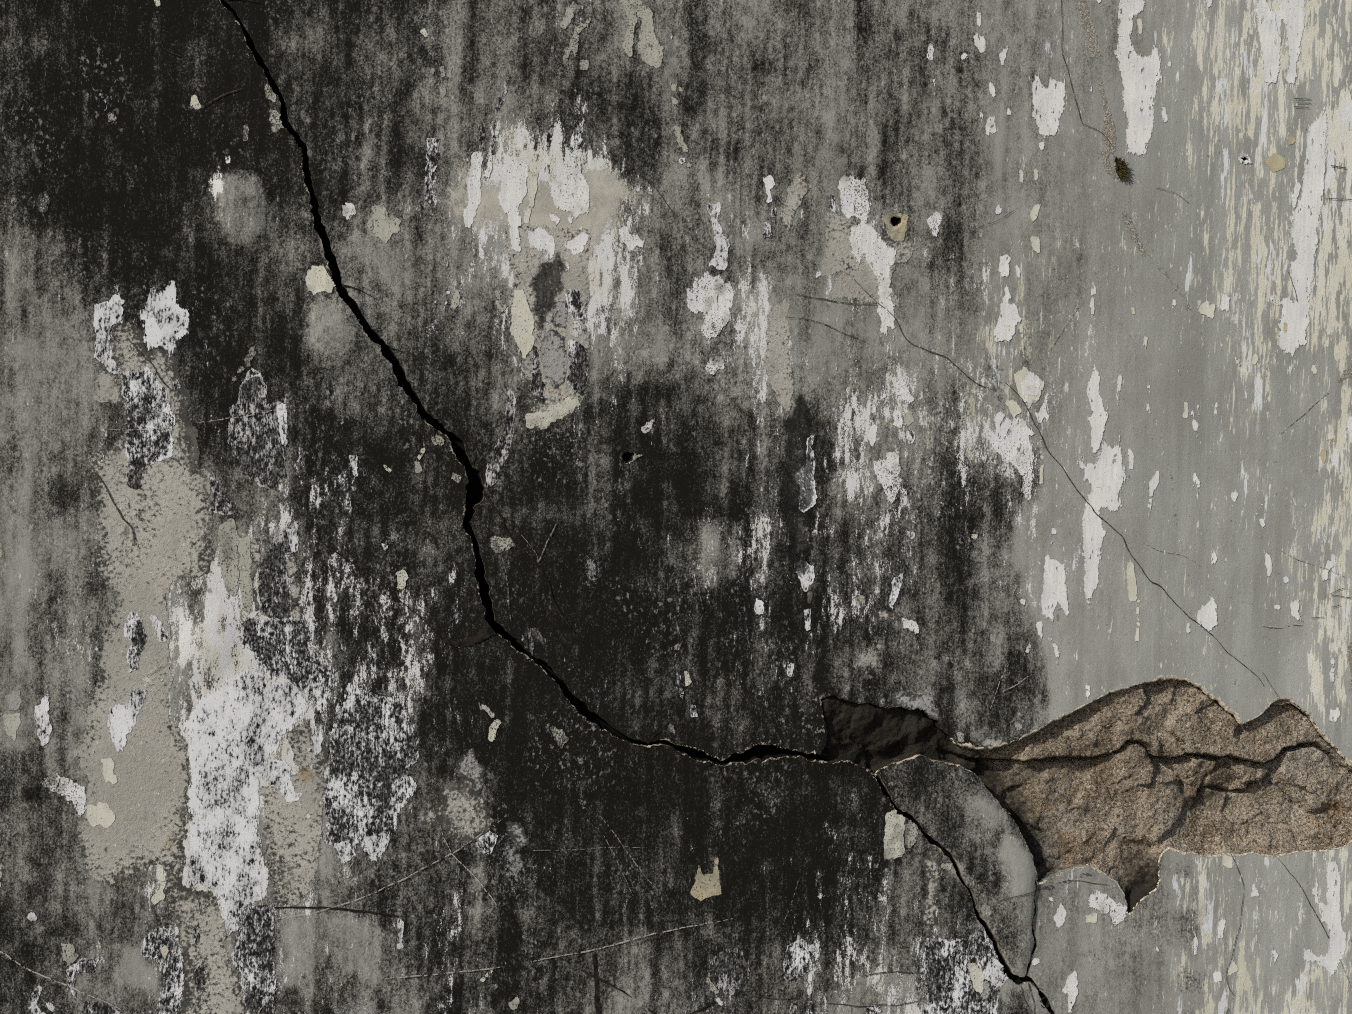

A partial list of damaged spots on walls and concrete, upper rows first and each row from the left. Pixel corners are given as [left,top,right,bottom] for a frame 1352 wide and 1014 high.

peeling [1114,0,1176,155]
crack [195,0,828,790]
peeling [424,74,650,488]
water stain [781,394,814,577]
peeling [816,175,919,338]
crack [788,279,1279,697]
peeling [1077,365,1163,611]
peeling [41,280,529,1014]
crack [274,906,397,917]
crack [581,954,657,1014]
crack [867,768,1107,1014]
spalling [818,670,1352,978]